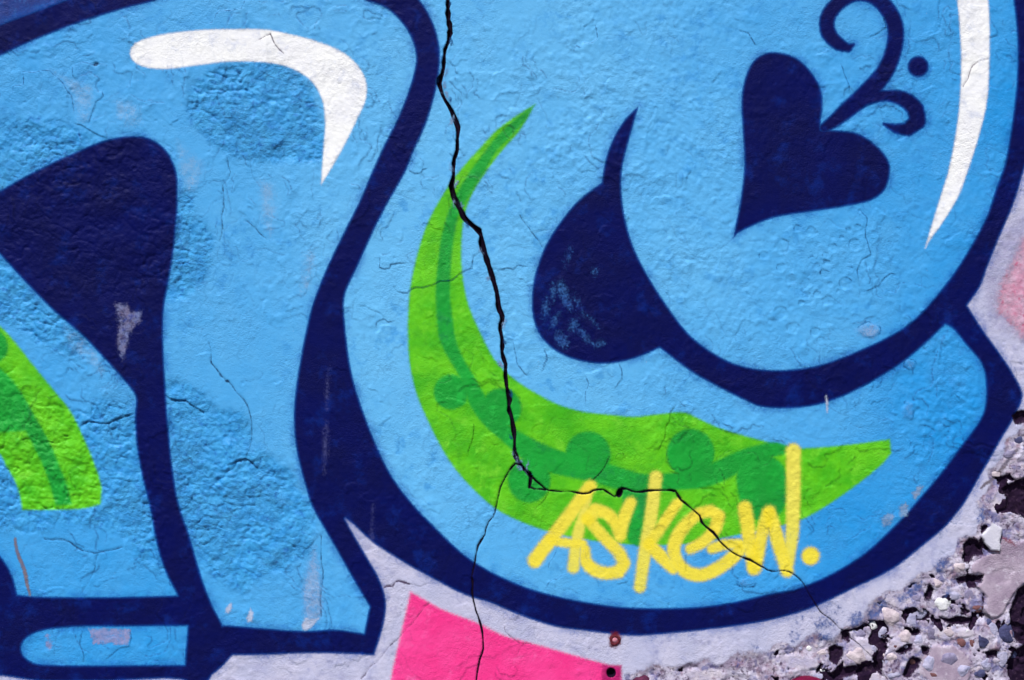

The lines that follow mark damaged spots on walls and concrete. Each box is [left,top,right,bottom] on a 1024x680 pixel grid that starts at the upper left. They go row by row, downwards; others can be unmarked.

crack [435,0,888,680]
rust [608,629,622,649]
spalling [625,410,1024,680]